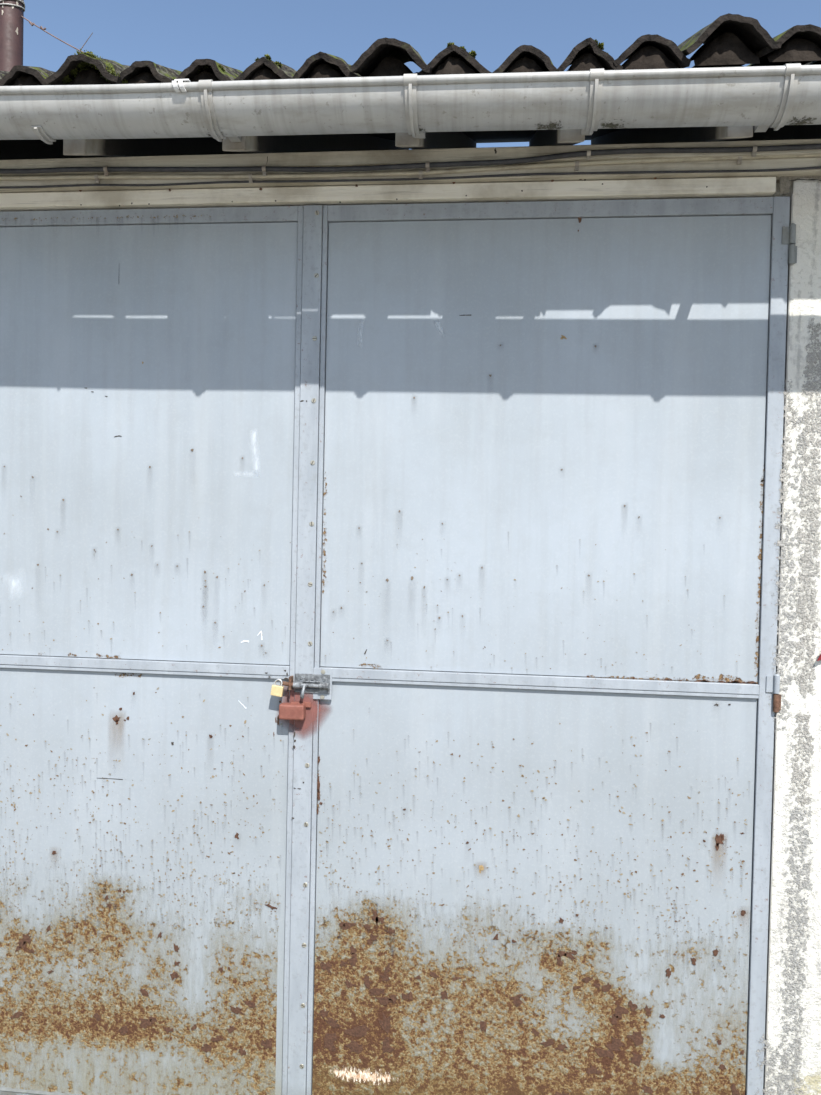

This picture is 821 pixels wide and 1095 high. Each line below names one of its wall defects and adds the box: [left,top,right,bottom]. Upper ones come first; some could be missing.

corrosion [587,468,765,684]
peeling [779,318,821,698]
corrosion [0,720,282,1095]
corrosion [312,736,750,1095]
peeling [789,711,814,805]